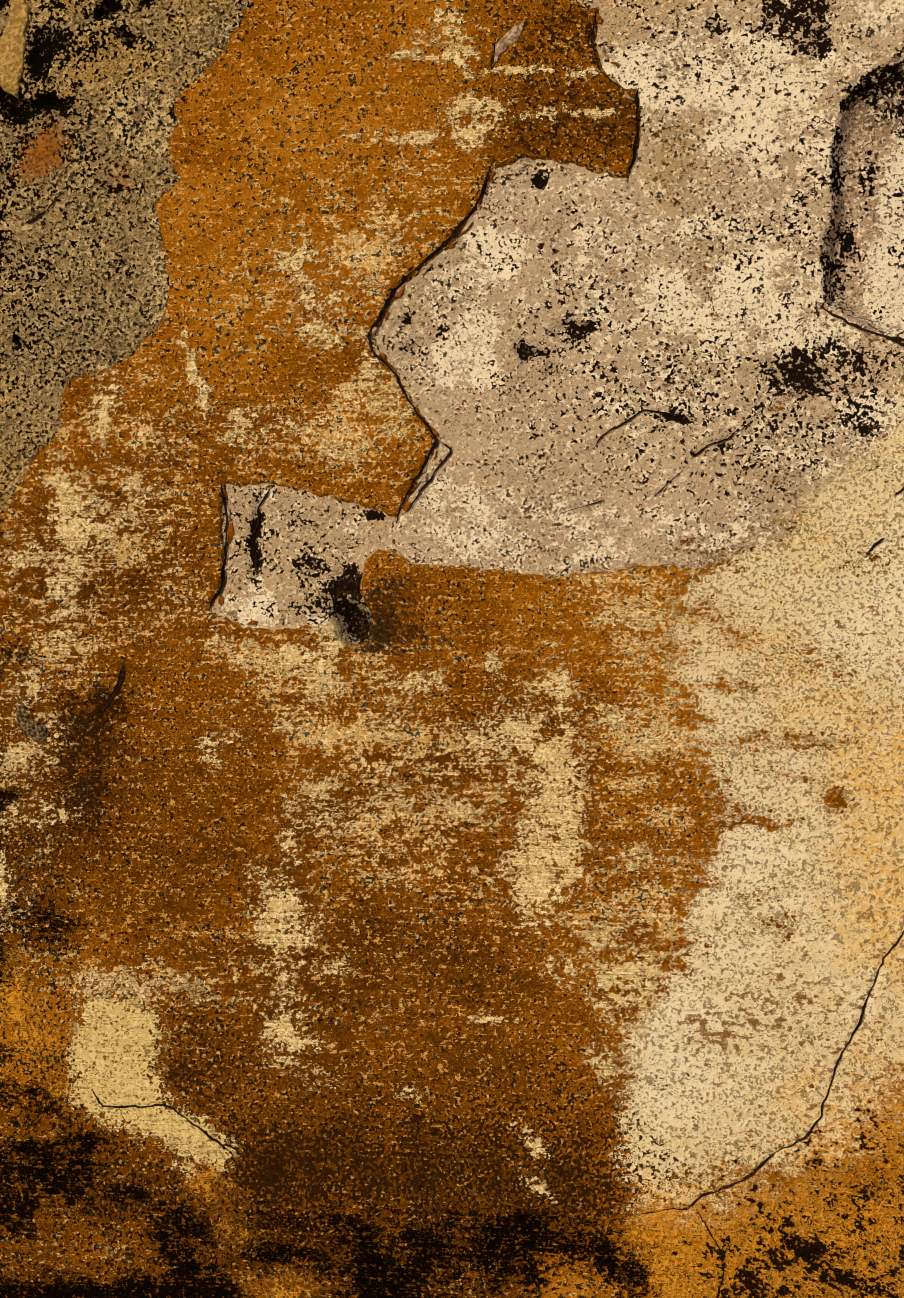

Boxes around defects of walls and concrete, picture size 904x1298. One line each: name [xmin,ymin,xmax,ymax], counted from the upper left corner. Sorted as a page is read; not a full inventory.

corrosion [12,114,74,186]
water stain [465,0,646,177]
crack [819,304,904,346]
crack [656,420,753,495]
spalling [176,0,904,1243]
crack [867,538,884,554]
corrosion [0,944,80,1101]
crack [92,1089,231,1153]
corrosion [178,1151,258,1255]
water stain [0,987,904,1298]
corrosion [587,1063,904,1298]
crack [611,930,904,1298]